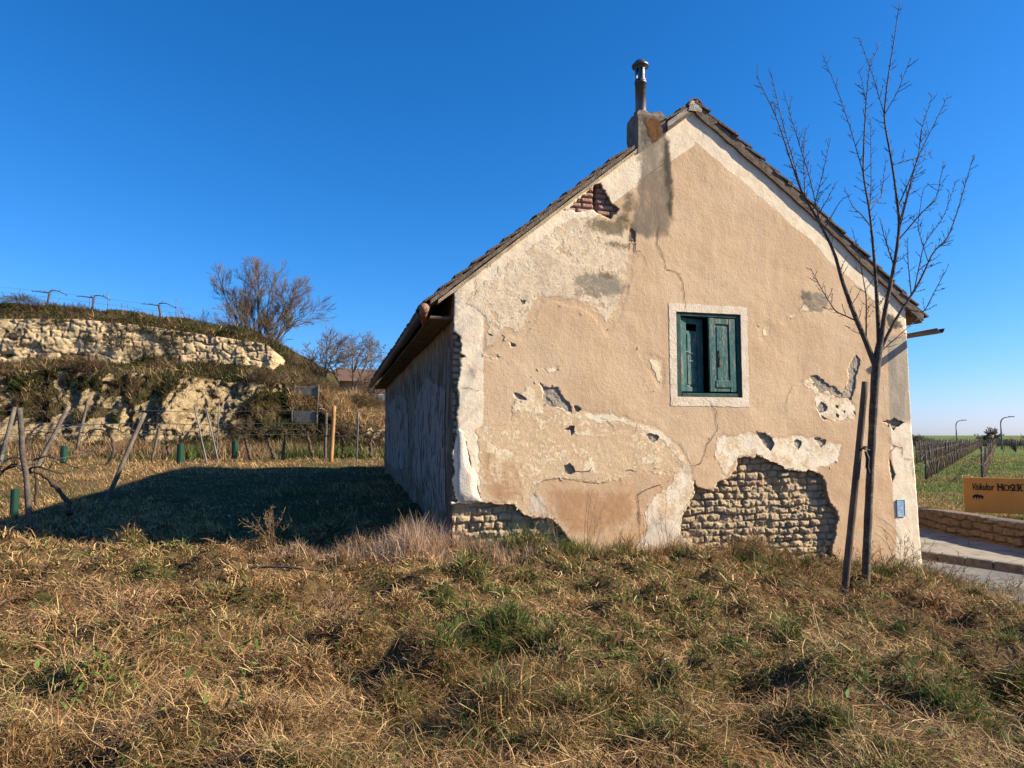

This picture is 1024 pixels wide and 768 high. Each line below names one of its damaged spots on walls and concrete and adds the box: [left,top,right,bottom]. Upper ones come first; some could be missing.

damp [589,135,674,248]
peeling [462,184,634,360]
damp [575,272,626,297]
crack [629,223,686,309]
peeling [801,356,859,422]
peeling [386,332,842,562]